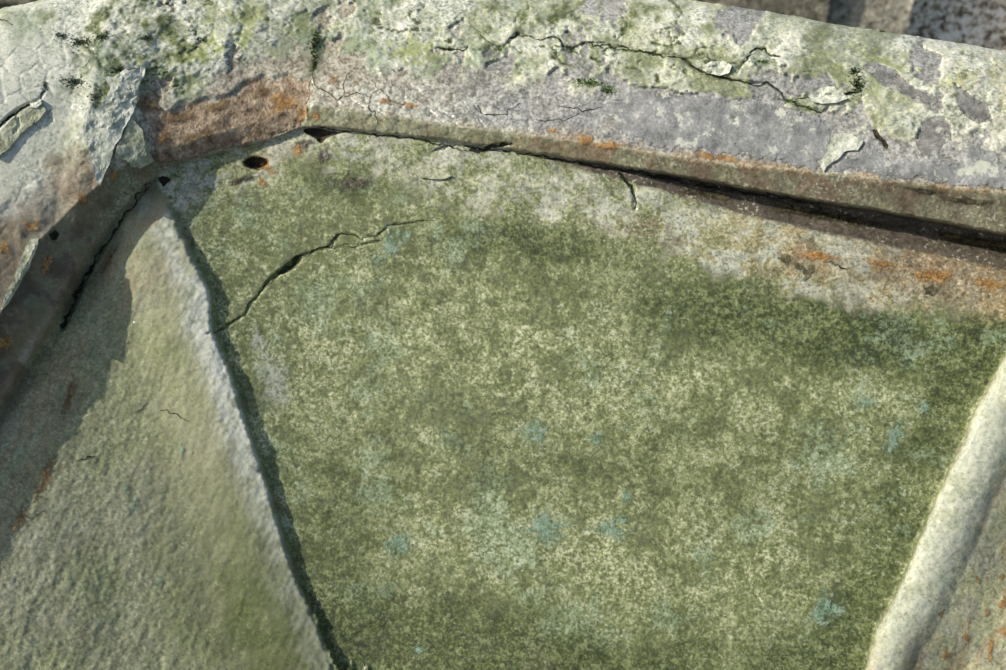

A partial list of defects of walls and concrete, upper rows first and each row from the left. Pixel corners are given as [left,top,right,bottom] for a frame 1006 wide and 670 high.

crack [0,91,45,126]
crack [312,73,821,209]
crack [437,31,822,113]
flaking render [699,61,732,76]
spalling [604,83,1006,189]
spalling [868,62,938,106]
crack [59,183,150,328]
crack [207,218,440,334]